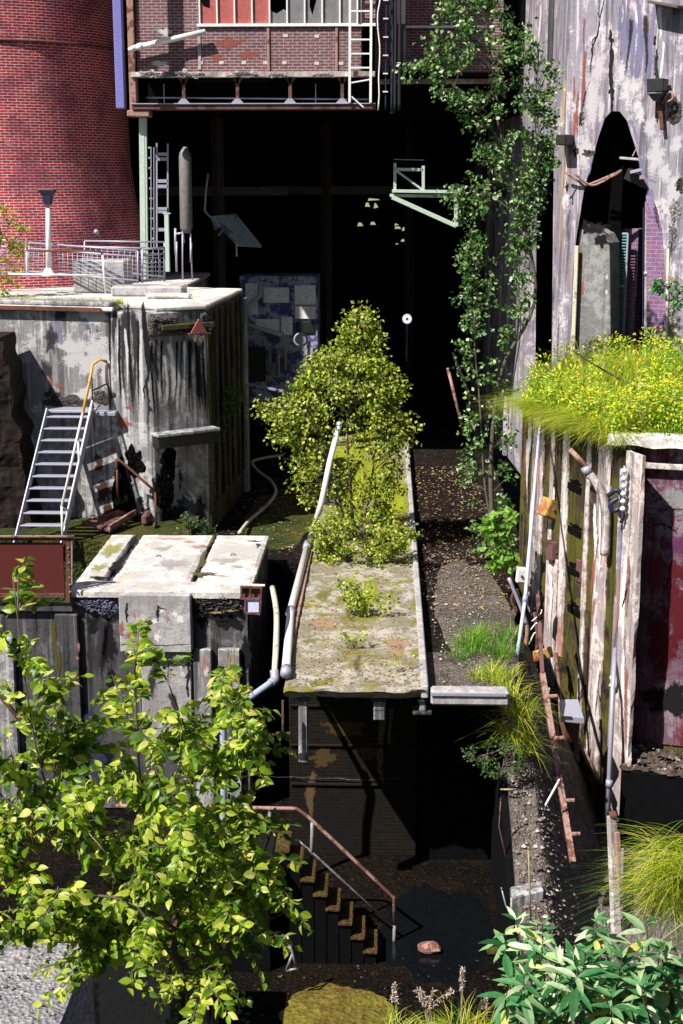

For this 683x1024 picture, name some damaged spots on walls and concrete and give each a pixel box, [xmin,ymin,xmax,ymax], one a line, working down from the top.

rust [571,51,586,150]
crack [581,0,615,112]
water stain [108,302,237,457]